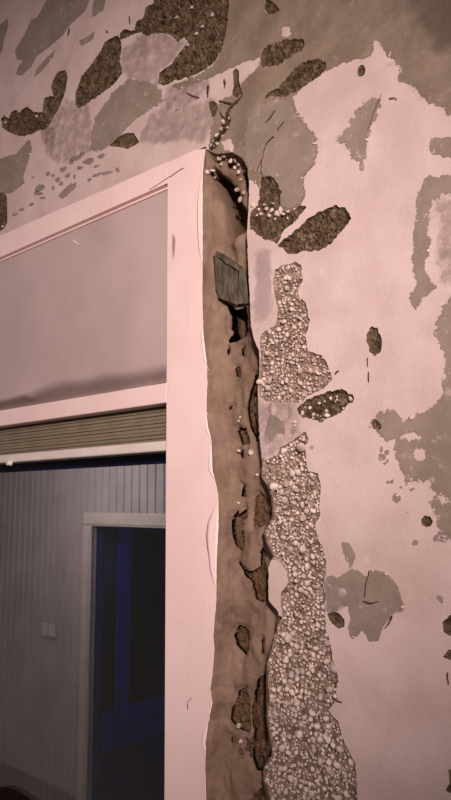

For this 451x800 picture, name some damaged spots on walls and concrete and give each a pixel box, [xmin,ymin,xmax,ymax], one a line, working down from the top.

flaking render [75,0,229,108]
flaking render [0,70,68,231]
peeling [46,167,76,199]
peeling [66,152,105,170]
crack [187,79,243,149]
flaking render [167,0,451,800]